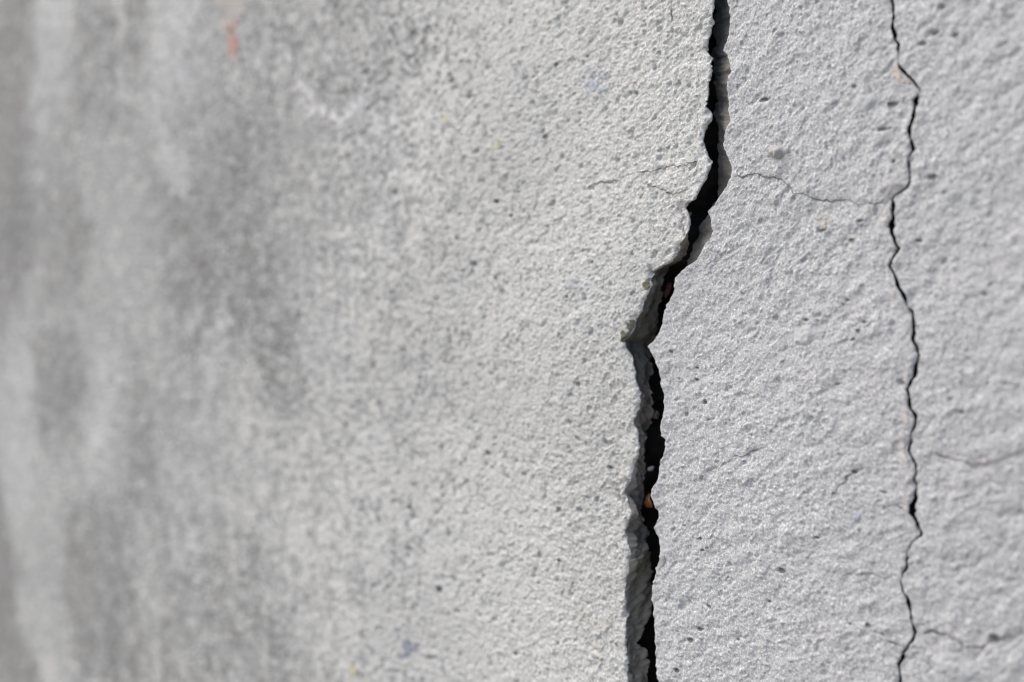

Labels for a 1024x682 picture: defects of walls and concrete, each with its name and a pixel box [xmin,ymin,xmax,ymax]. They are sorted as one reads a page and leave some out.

crack [583,0,1024,682]